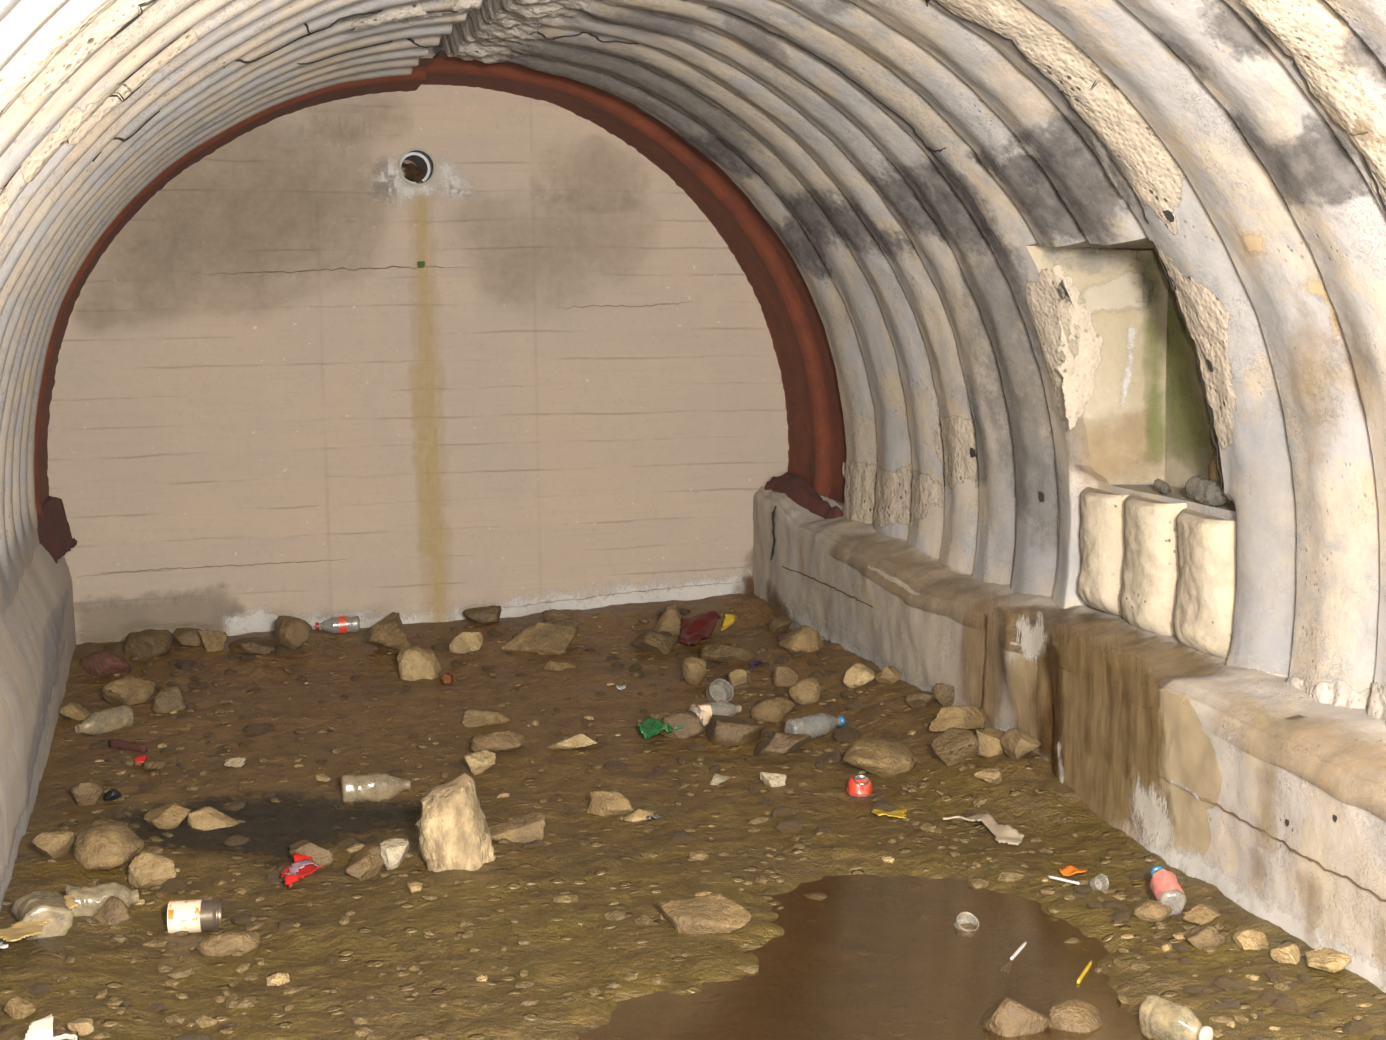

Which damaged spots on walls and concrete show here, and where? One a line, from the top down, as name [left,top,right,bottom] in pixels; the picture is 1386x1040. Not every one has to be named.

leakage [373,158,471,199]
spalling [342,0,601,64]
spalling [936,0,1186,235]
spalling [1240,0,1386,201]
crack [198,266,469,275]
spalling [1025,264,1153,430]
spalling [1157,246,1236,450]
leakage [742,579,885,670]
spalling [1265,672,1386,725]
leakage [963,602,1386,993]
crack [1131,763,1386,902]